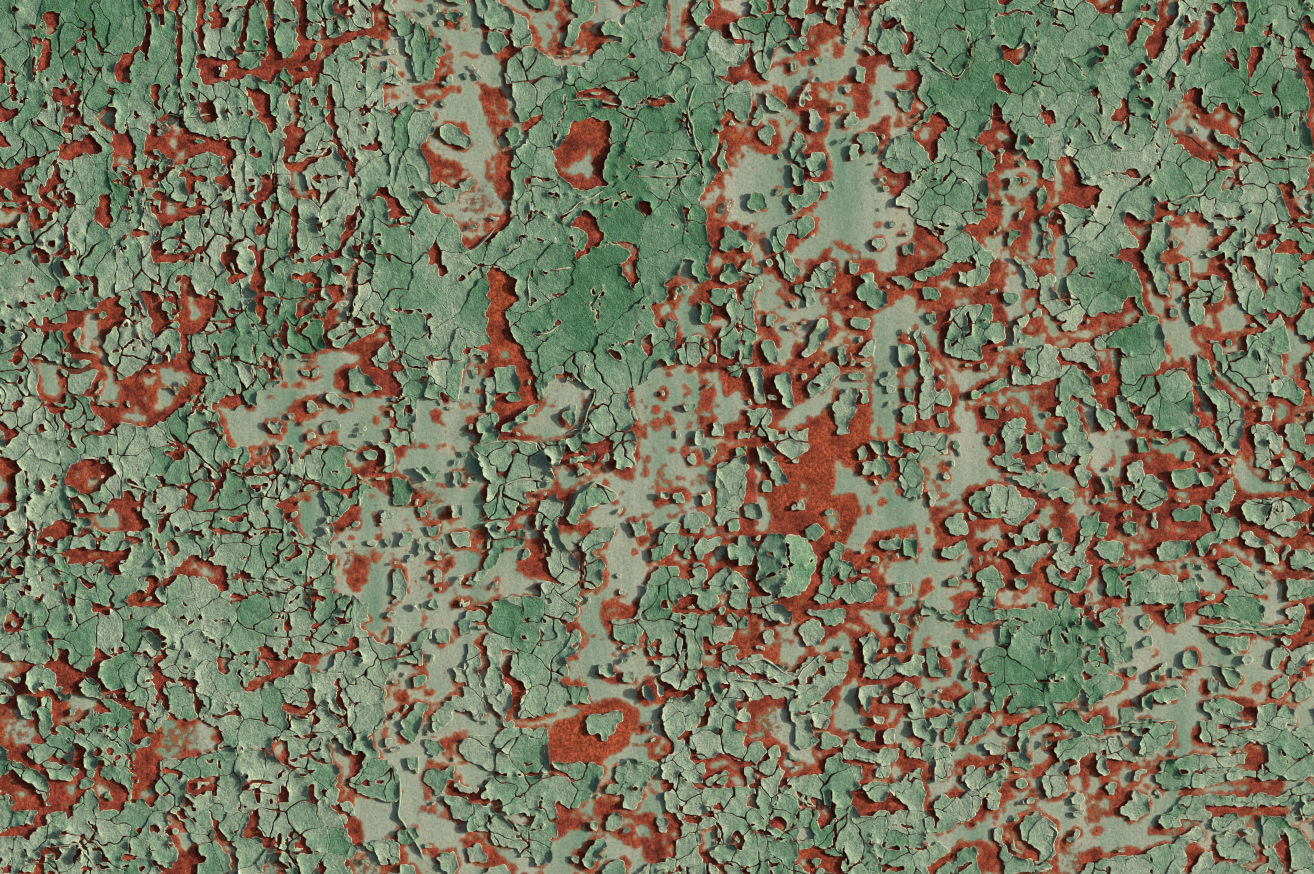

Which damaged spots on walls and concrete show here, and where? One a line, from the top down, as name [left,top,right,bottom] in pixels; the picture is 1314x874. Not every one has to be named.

crack [182,95,278,254]
rust [0,0,691,728]
crack [326,174,453,432]
peeling [0,0,885,874]
crack [459,97,703,345]
crack [910,0,1207,227]
crack [1214,157,1290,250]
crack [0,286,386,874]
rust [0,626,421,874]
rust [420,730,547,874]
crack [674,617,686,679]
crack [759,794,925,874]